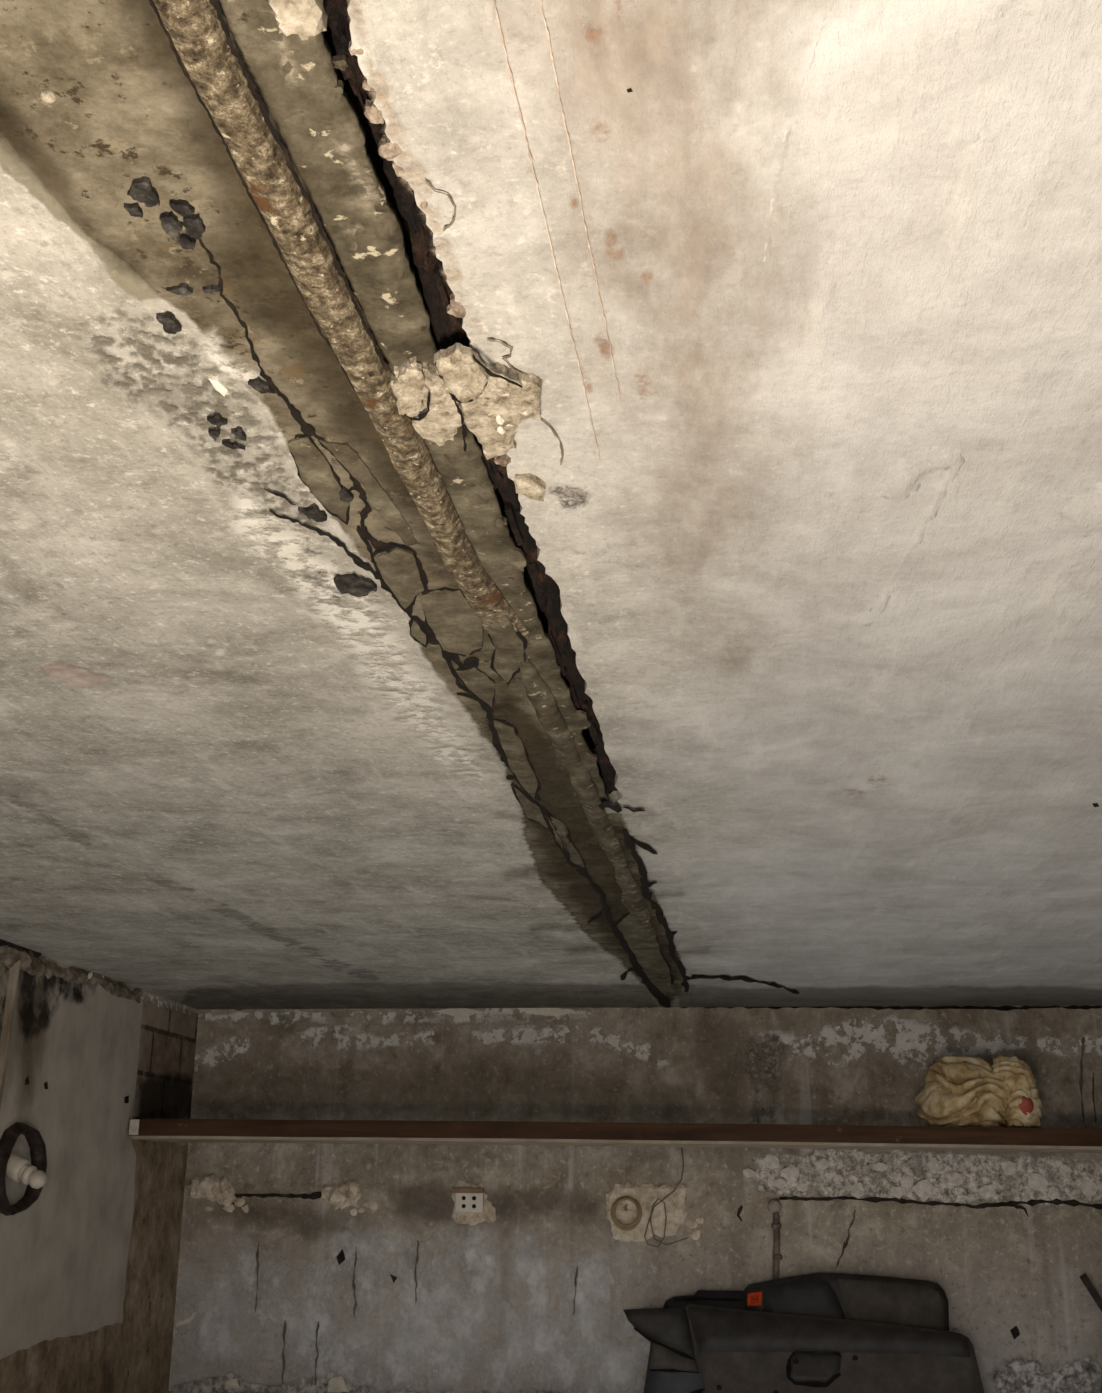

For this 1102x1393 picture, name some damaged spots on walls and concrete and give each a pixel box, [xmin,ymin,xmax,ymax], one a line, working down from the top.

peeling [268,0,328,40]
rust [341,27,385,137]
peeling [124,176,206,251]
crack [425,180,456,231]
peeling [390,343,542,460]
water stain [0,0,683,1000]
spalling [288,435,588,870]
crack [180,222,1102,1124]
water stain [0,967,85,1093]
crack [222,1191,322,1210]
spalling [743,1149,1102,1207]
crack [779,1196,1102,1268]